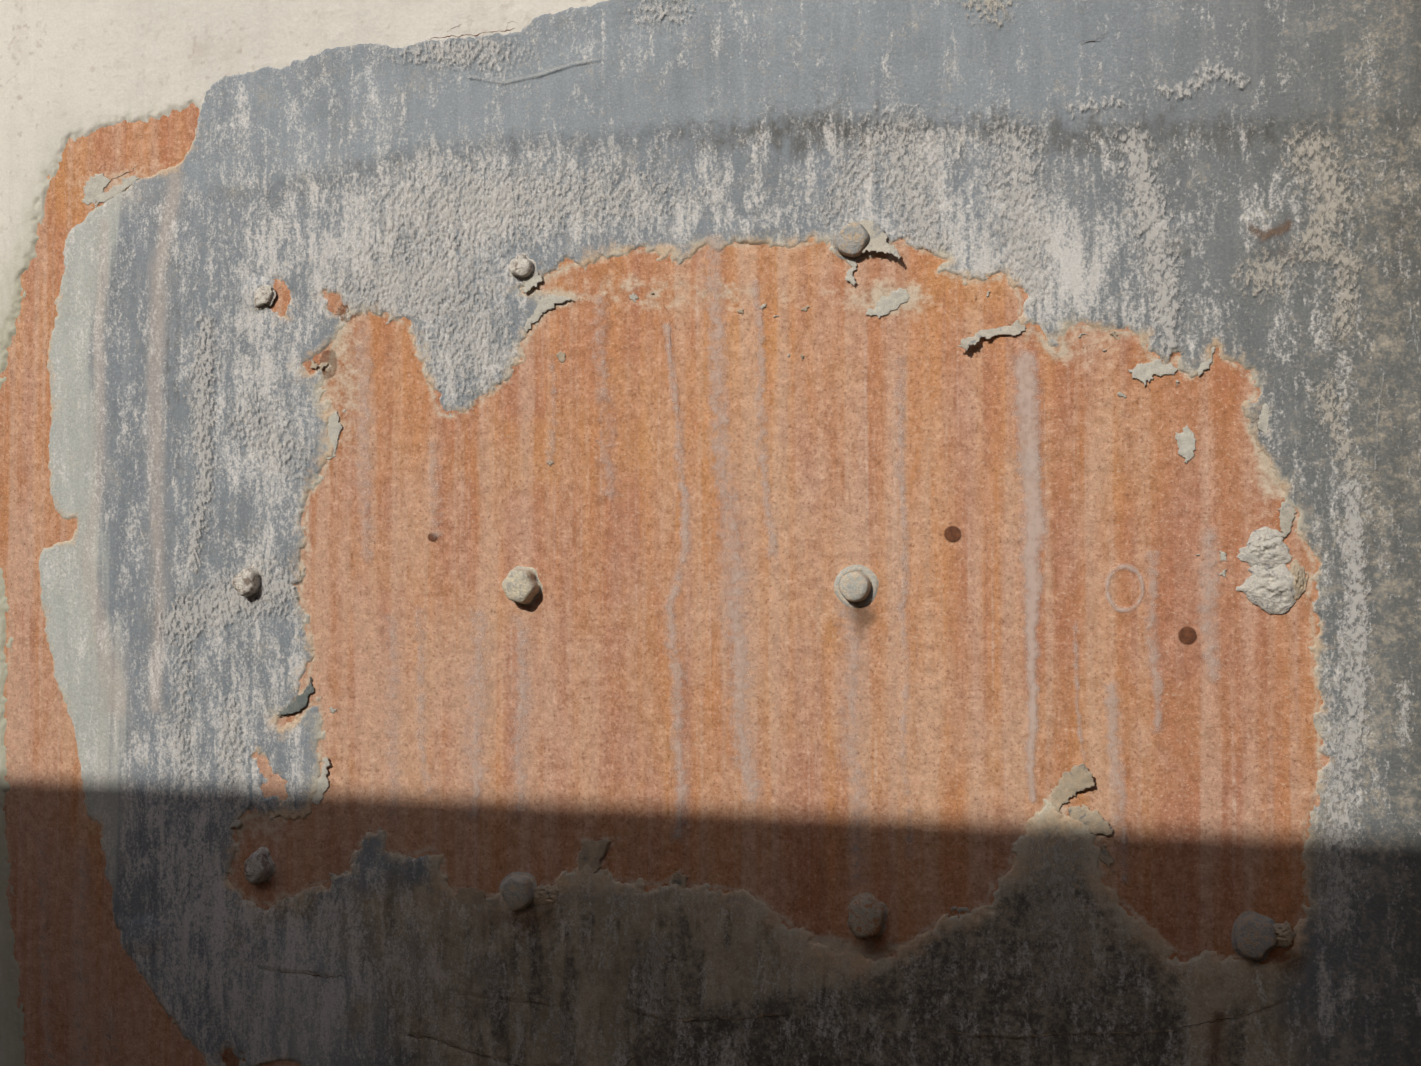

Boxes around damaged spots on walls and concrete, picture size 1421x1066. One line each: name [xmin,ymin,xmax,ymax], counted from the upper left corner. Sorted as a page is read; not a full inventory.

rust [944,526,961,542]
peeling [228,219,1329,964]
rust [1178,627,1197,644]